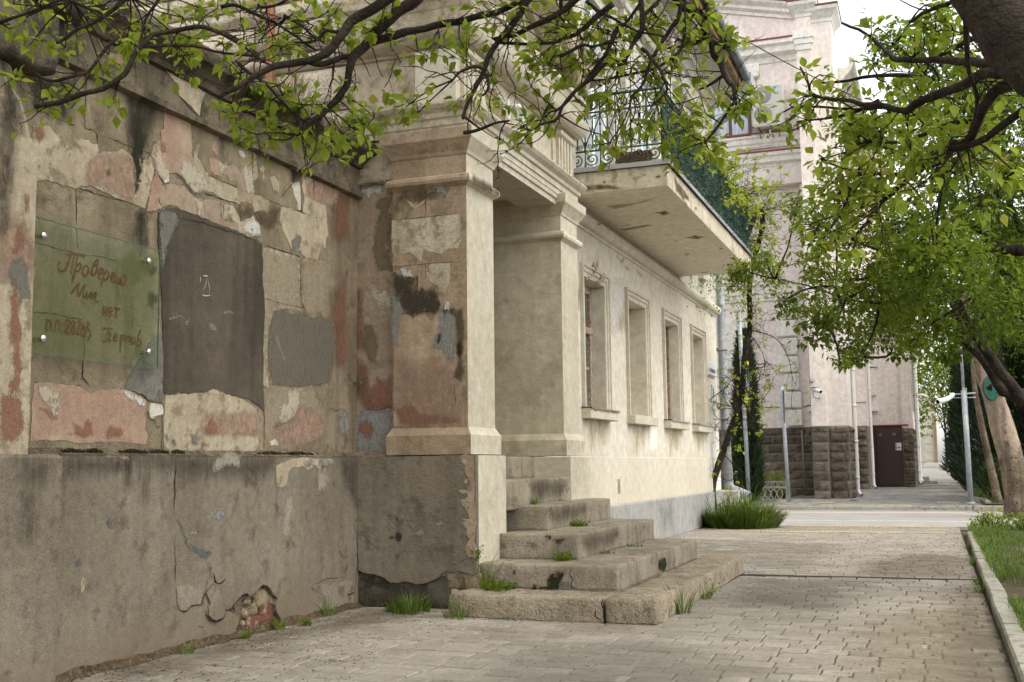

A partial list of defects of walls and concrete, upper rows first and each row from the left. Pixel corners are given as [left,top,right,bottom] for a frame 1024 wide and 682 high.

leakage [127,96,157,146]
flaking render [29,71,340,487]
flaking render [361,185,464,427]
crack [158,471,226,628]
flaking render [240,588,279,628]
flaking render [459,454,477,558]